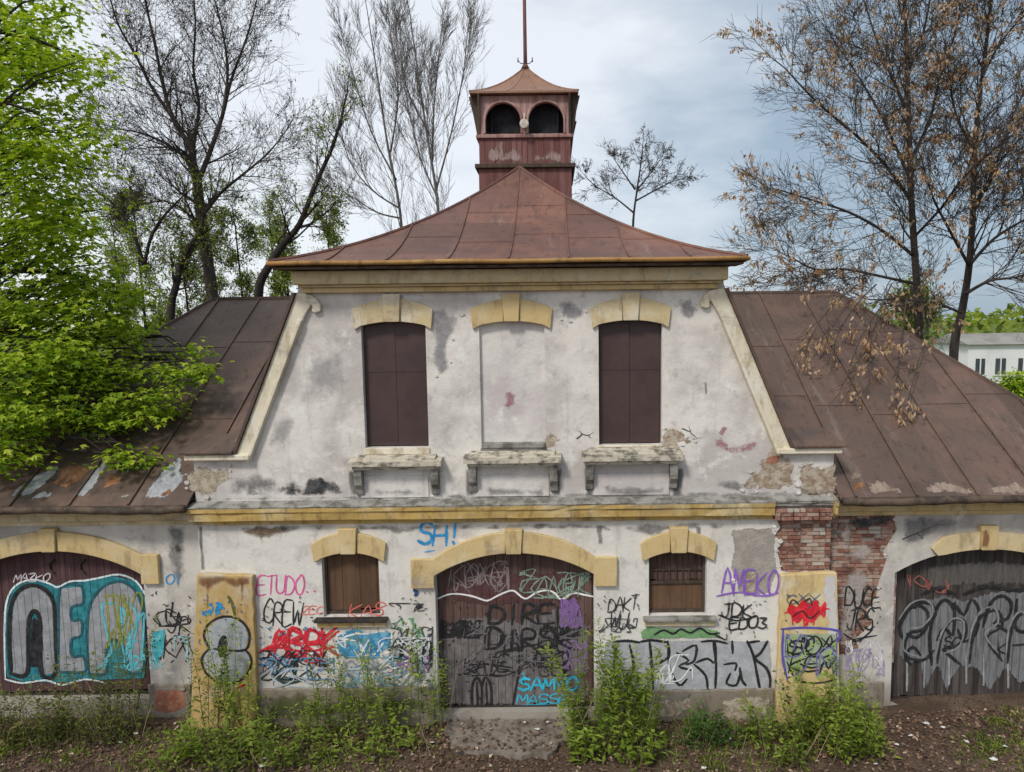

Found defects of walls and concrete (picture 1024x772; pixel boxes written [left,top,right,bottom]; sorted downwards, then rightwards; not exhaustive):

peeling [489,142,521,161]
spalling [662,428,697,465]
spalling [184,464,232,500]
damp [237,472,361,500]
flaking render [731,448,897,663]